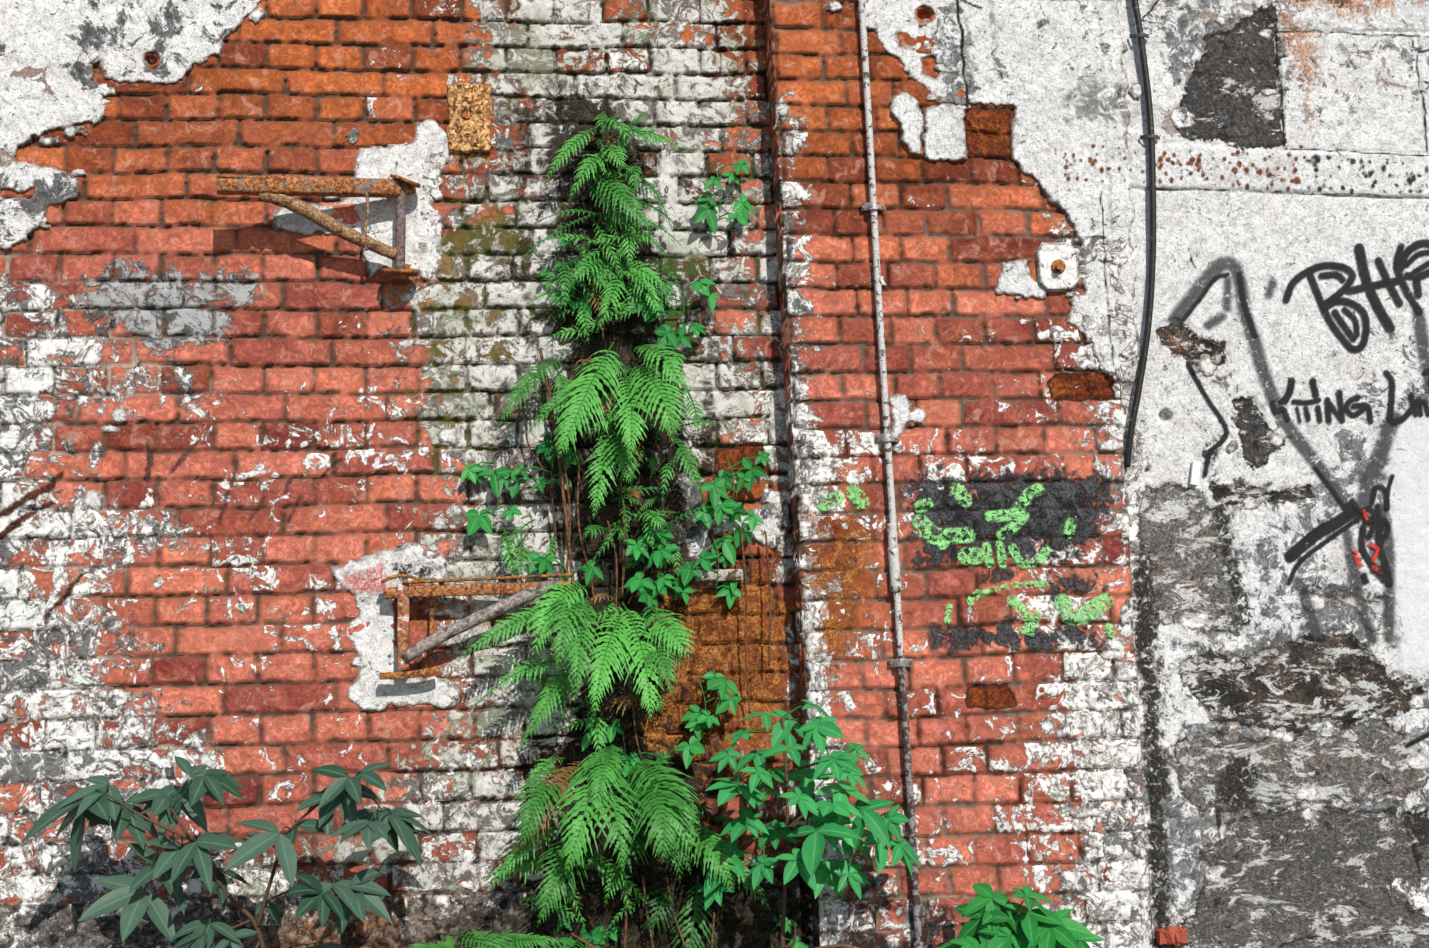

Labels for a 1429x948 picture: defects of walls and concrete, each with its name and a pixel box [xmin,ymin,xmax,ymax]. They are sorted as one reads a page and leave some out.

peeling [0,0,858,931]
corrosion [410,602,535,629]
peeling [796,885,859,948]
flaking render [826,0,1429,948]